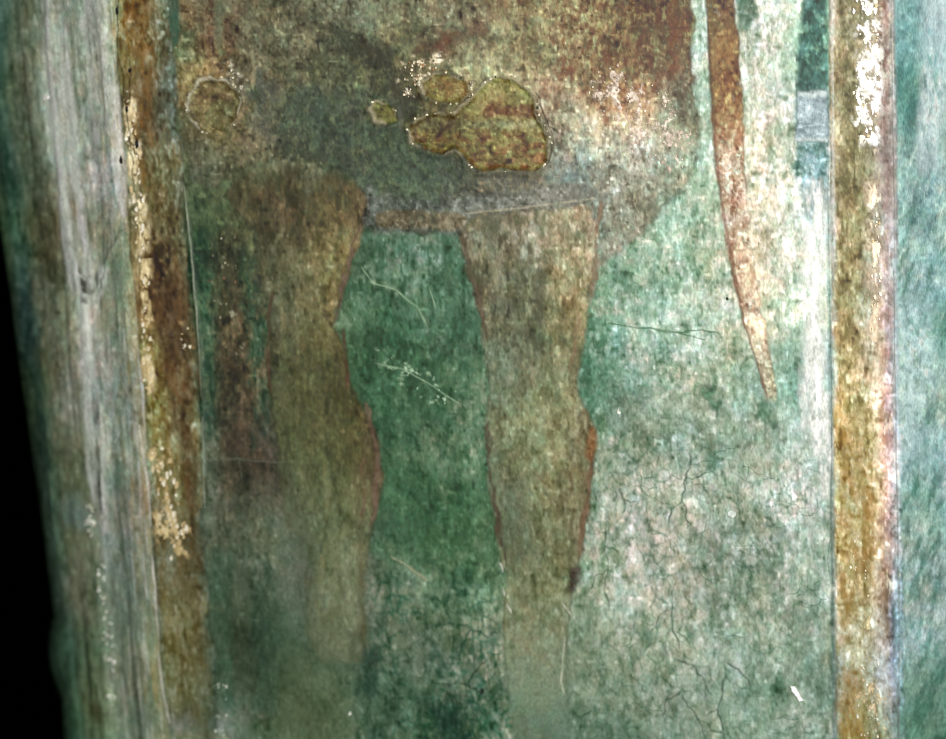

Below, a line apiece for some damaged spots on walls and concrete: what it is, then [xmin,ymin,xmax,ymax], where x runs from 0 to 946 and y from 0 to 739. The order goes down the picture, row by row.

peeling [852,0,883,145]
peeling [124,89,156,399]
peeling [148,445,191,560]